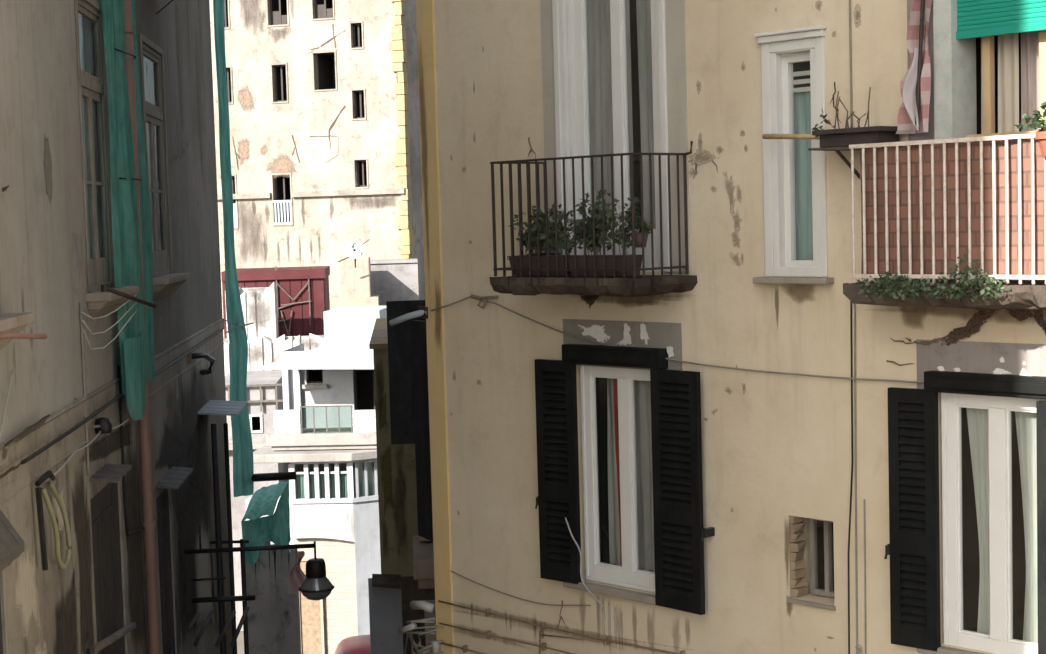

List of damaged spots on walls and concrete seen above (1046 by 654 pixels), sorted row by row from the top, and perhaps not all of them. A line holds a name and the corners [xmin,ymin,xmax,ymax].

damp [241,0,258,23]
flaking render [237,87,254,109]
flaking render [238,139,296,177]
peeling [689,133,724,177]
damp [238,204,320,258]
damp [352,198,394,208]
flaking render [711,172,744,266]
crack [886,338,945,366]